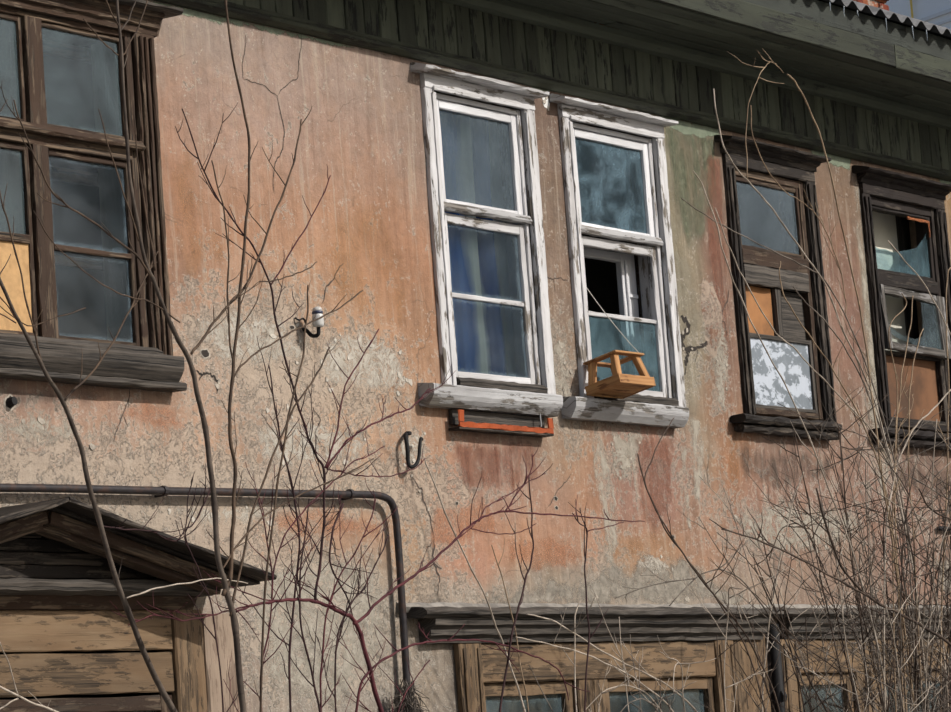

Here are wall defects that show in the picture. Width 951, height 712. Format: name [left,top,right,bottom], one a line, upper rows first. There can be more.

peeling [197,309,306,365]
peeling [320,332,413,396]
peeling [553,340,573,397]
crack [680,291,729,375]
peeling [713,326,728,411]
peeling [167,505,272,526]
peeling [259,404,366,466]
peeling [401,432,426,467]
water stain [594,444,617,562]
water stain [682,420,703,527]